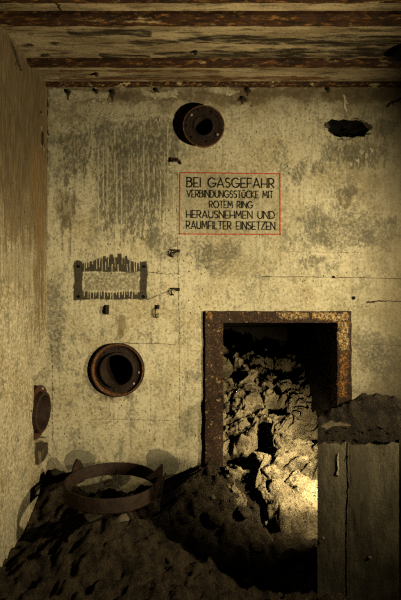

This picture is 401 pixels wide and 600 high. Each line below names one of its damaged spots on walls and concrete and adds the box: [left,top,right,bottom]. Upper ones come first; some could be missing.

water stain [292,119,396,185]
spalling [324,118,372,140]
water stain [58,115,237,278]
water stain [298,188,400,252]
rust [279,311,349,397]
spalling [318,421,391,440]